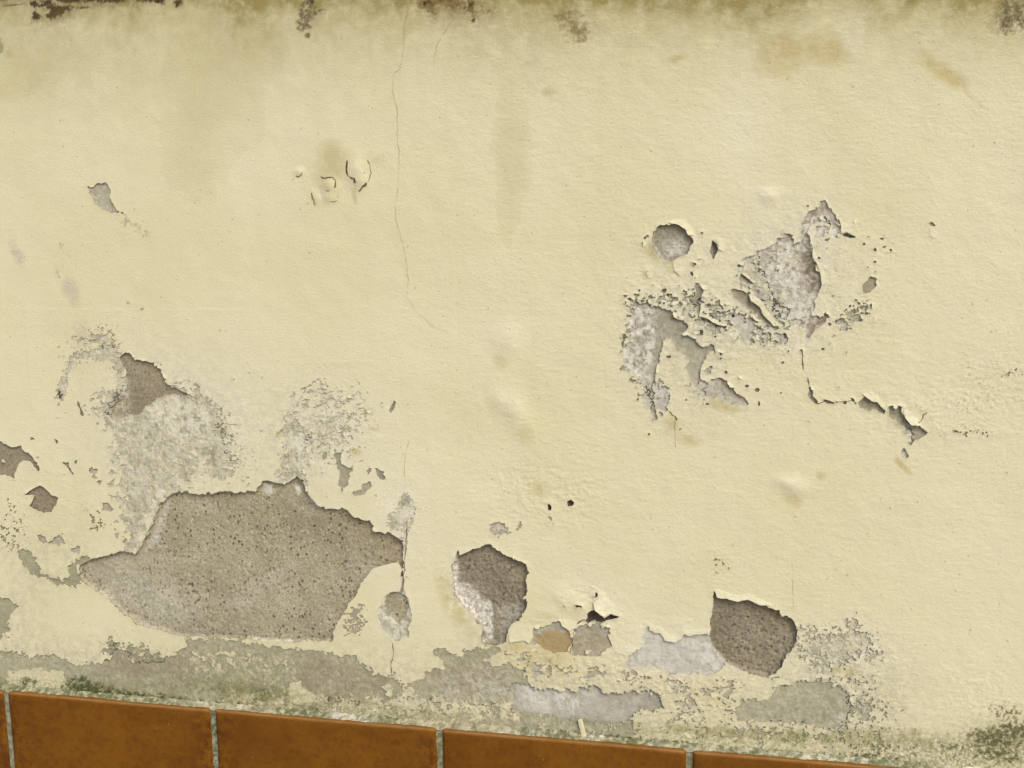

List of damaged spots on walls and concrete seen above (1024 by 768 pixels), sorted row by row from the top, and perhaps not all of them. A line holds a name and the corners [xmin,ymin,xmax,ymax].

damp [30,0,120,20]
damp [297,0,320,38]
damp [419,0,475,22]
damp [1001,1,1024,28]
peeling [88,183,126,215]
peeling [619,200,894,436]
spalling [0,322,962,760]